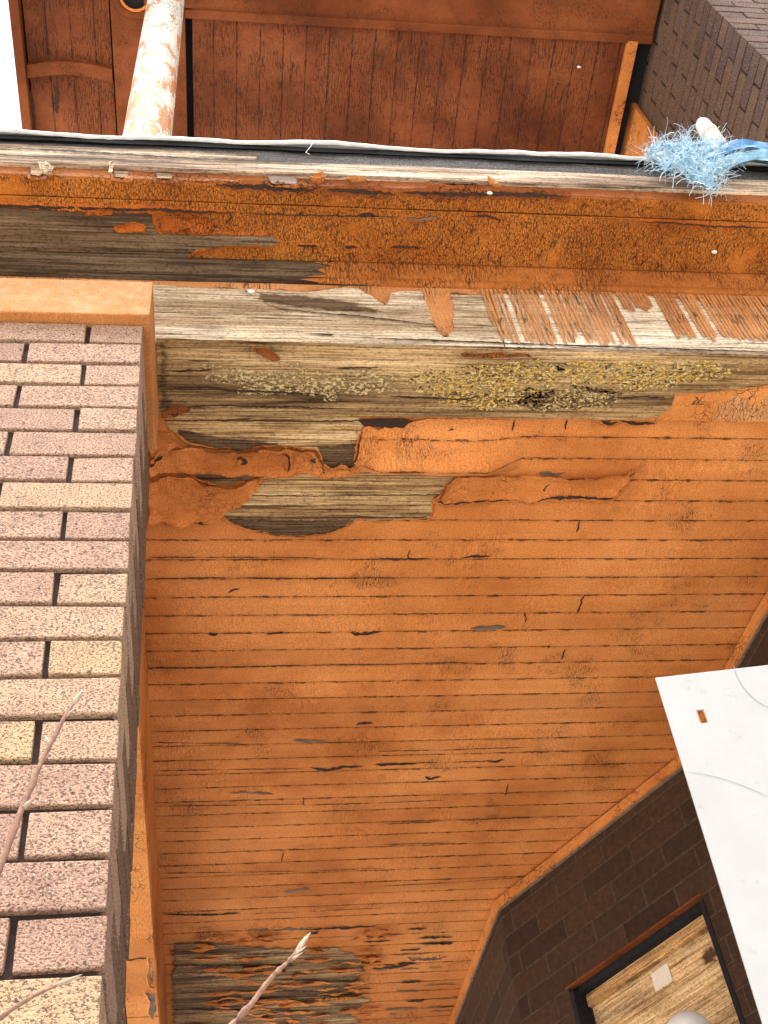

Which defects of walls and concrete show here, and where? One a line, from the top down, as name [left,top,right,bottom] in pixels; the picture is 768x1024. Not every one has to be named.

peeling [27,161,53,180]
peeling [108,161,133,182]
peeling [152,173,178,183]
peeling [265,171,326,189]
peeling [344,175,368,183]
peeling [425,175,503,189]
peeling [5,204,281,258]
peeling [175,285,768,358]
peeling [252,348,280,361]
peeling [148,405,630,538]
peeling [182,924,457,1024]